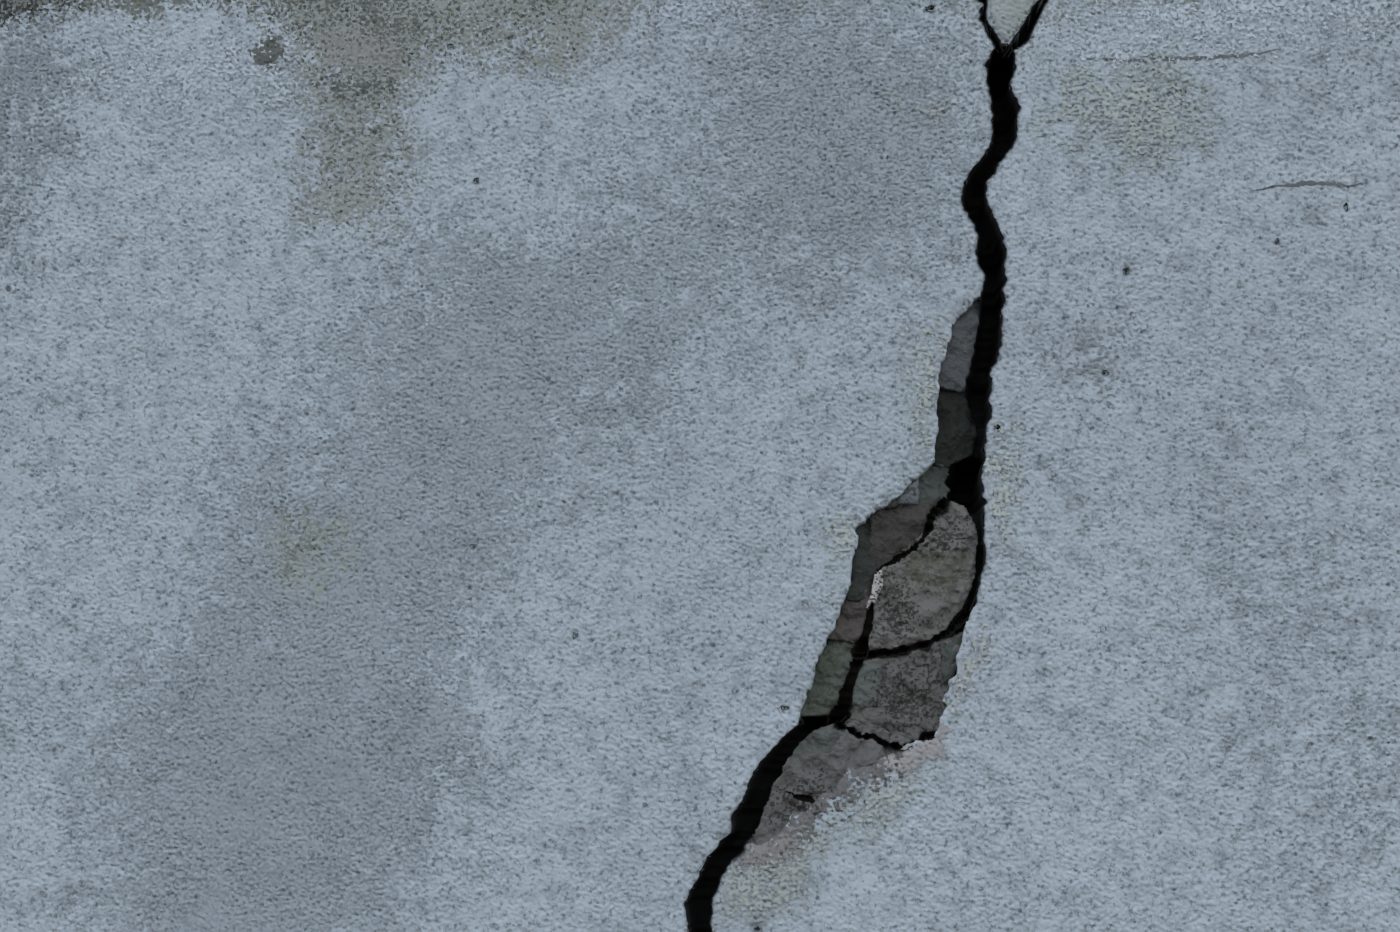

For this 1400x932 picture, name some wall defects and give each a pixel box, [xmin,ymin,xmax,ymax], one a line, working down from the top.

spalling [712,300,1005,932]
crack [684,0,1048,932]